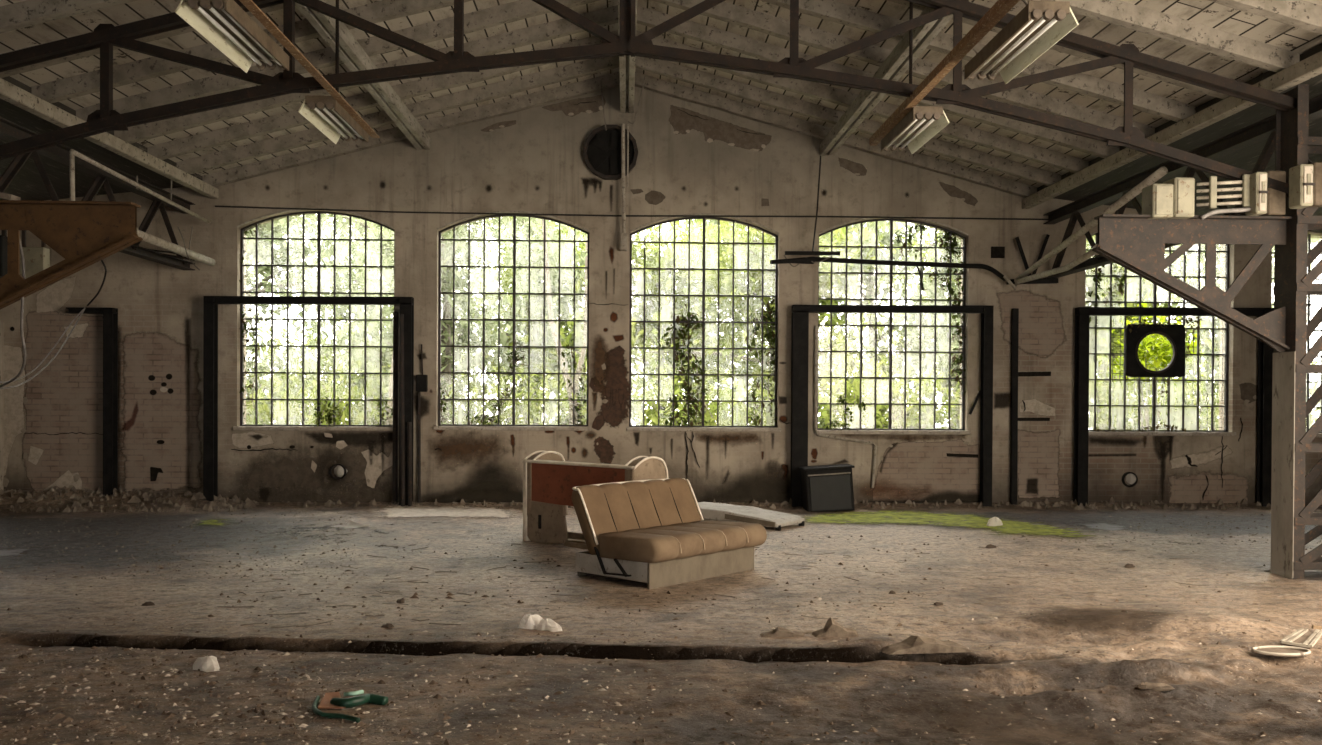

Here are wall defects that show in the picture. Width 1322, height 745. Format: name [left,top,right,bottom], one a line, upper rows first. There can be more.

damp [582,178,613,203]
peeling [232,431,274,448]
peeling [290,432,393,488]